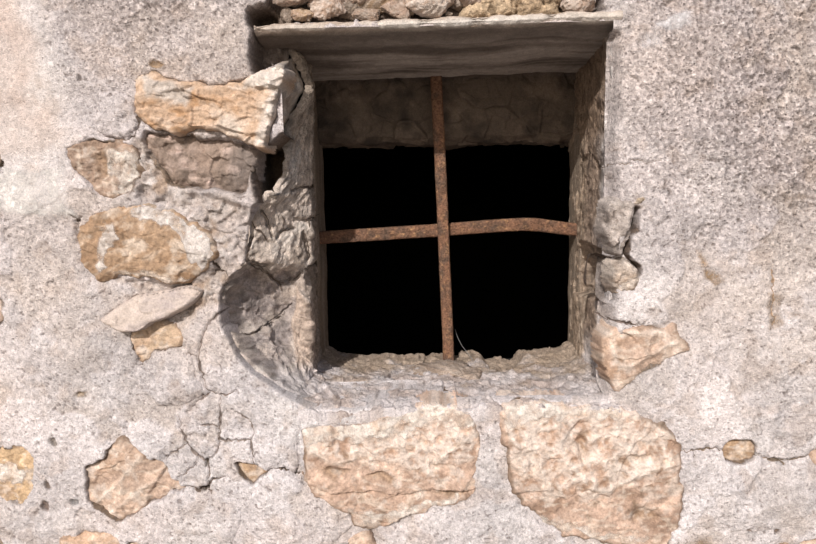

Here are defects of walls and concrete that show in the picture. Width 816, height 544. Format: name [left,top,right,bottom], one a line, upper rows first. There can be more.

spalling [269,0,596,27]
spalling [67,58,304,362]
crack [213,260,228,286]
crack [242,211,319,335]
crack [167,307,302,494]
spalling [590,319,690,392]
spalling [0,445,34,504]
spalling [86,435,186,522]
spalling [302,389,480,544]
spalling [496,388,684,544]